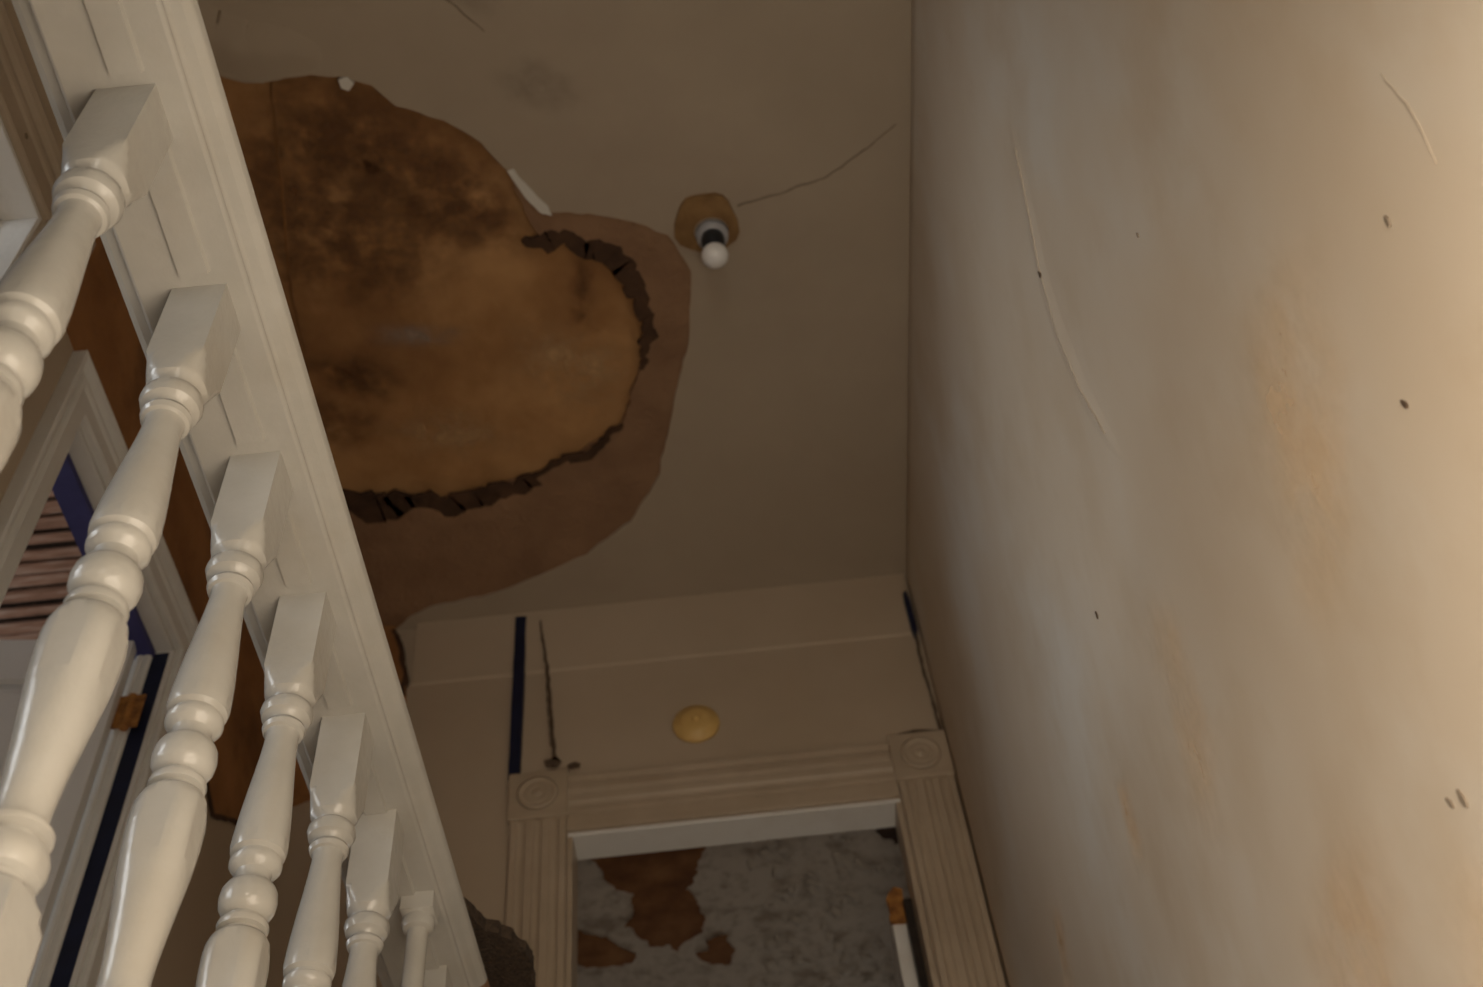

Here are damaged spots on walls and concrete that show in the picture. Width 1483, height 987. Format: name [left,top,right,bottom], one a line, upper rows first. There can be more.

spalling [66,236,147,451]
spalling [220,75,691,702]
spalling [162,447,211,624]
spalling [206,617,265,826]
spalling [293,758,310,806]
crack [540,621,581,770]
peeling [577,847,735,968]